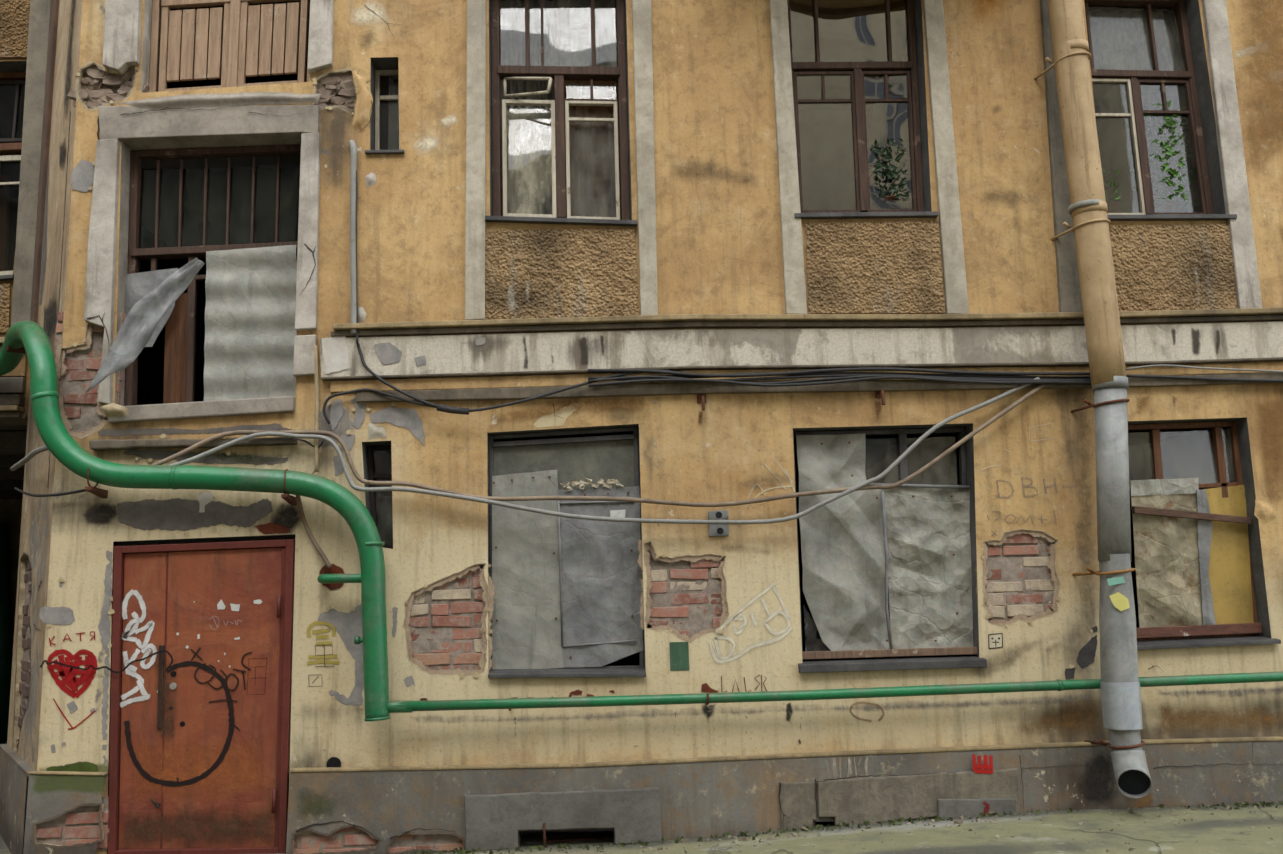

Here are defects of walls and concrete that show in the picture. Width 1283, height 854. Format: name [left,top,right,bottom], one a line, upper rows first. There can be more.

flaking render [67,62,150,110]
flaking render [312,70,358,115]
flaking render [54,312,125,438]
flaking render [12,553,75,752]
flaking render [392,563,495,687]
flaking render [637,540,729,643]
flaking render [975,529,1060,627]
flaking render [32,796,109,850]
flaking render [291,824,466,854]